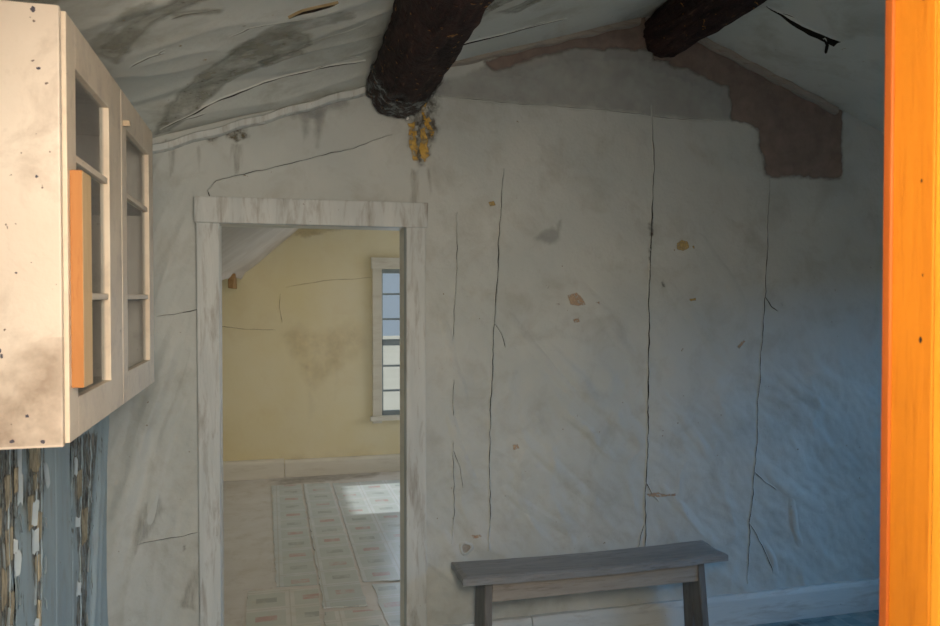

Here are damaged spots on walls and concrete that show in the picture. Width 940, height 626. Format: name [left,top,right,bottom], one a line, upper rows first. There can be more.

crack [451,212,459,341]
crack [451,441,464,544]
crack [487,168,506,551]
crack [637,105,660,547]
peeling [485,17,843,179]
crack [746,177,778,584]